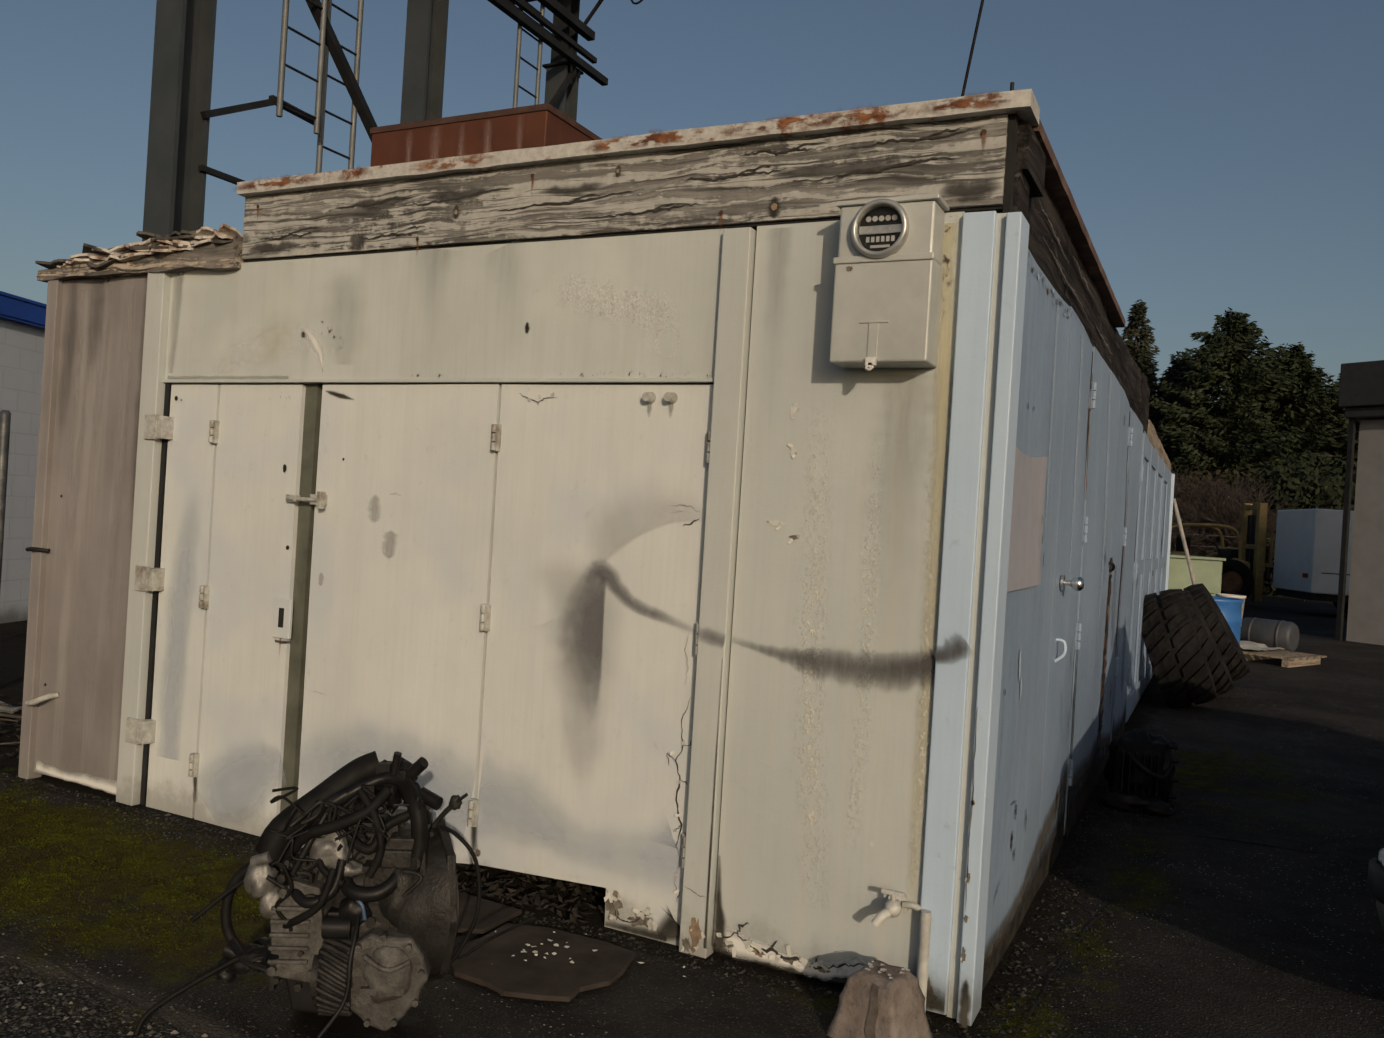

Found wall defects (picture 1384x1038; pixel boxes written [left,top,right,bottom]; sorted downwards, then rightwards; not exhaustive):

rust [593,131,701,150]
rust [741,109,890,132]
rust [933,95,1003,111]
crack [667,634,704,900]
water stain [926,700,1127,1029]
peeling [604,889,658,931]
peeling [681,918,865,978]